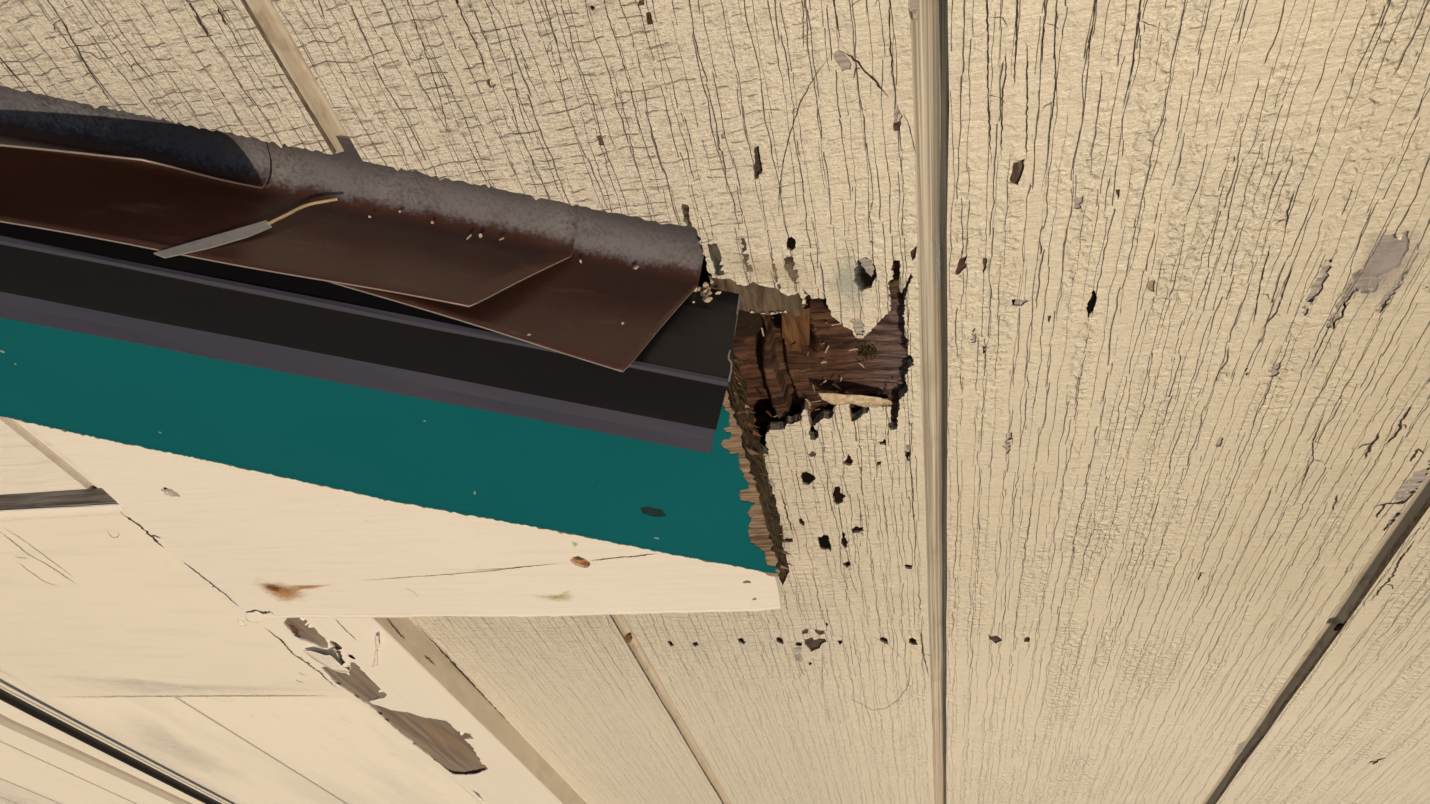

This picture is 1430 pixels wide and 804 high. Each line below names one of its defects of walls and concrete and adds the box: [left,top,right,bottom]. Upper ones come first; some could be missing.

crack [455,0,534,146]
crack [604,0,642,138]
crack [778,0,916,211]
crack [986,0,1097,173]
crack [1124,0,1156,104]
peeling [708,238,806,317]
crack [1254,192,1295,328]
peeling [1303,230,1409,327]
crack [1358,372,1430,461]
crack [1371,542,1414,601]
peeling [284,617,487,774]
peeling [794,623,842,665]